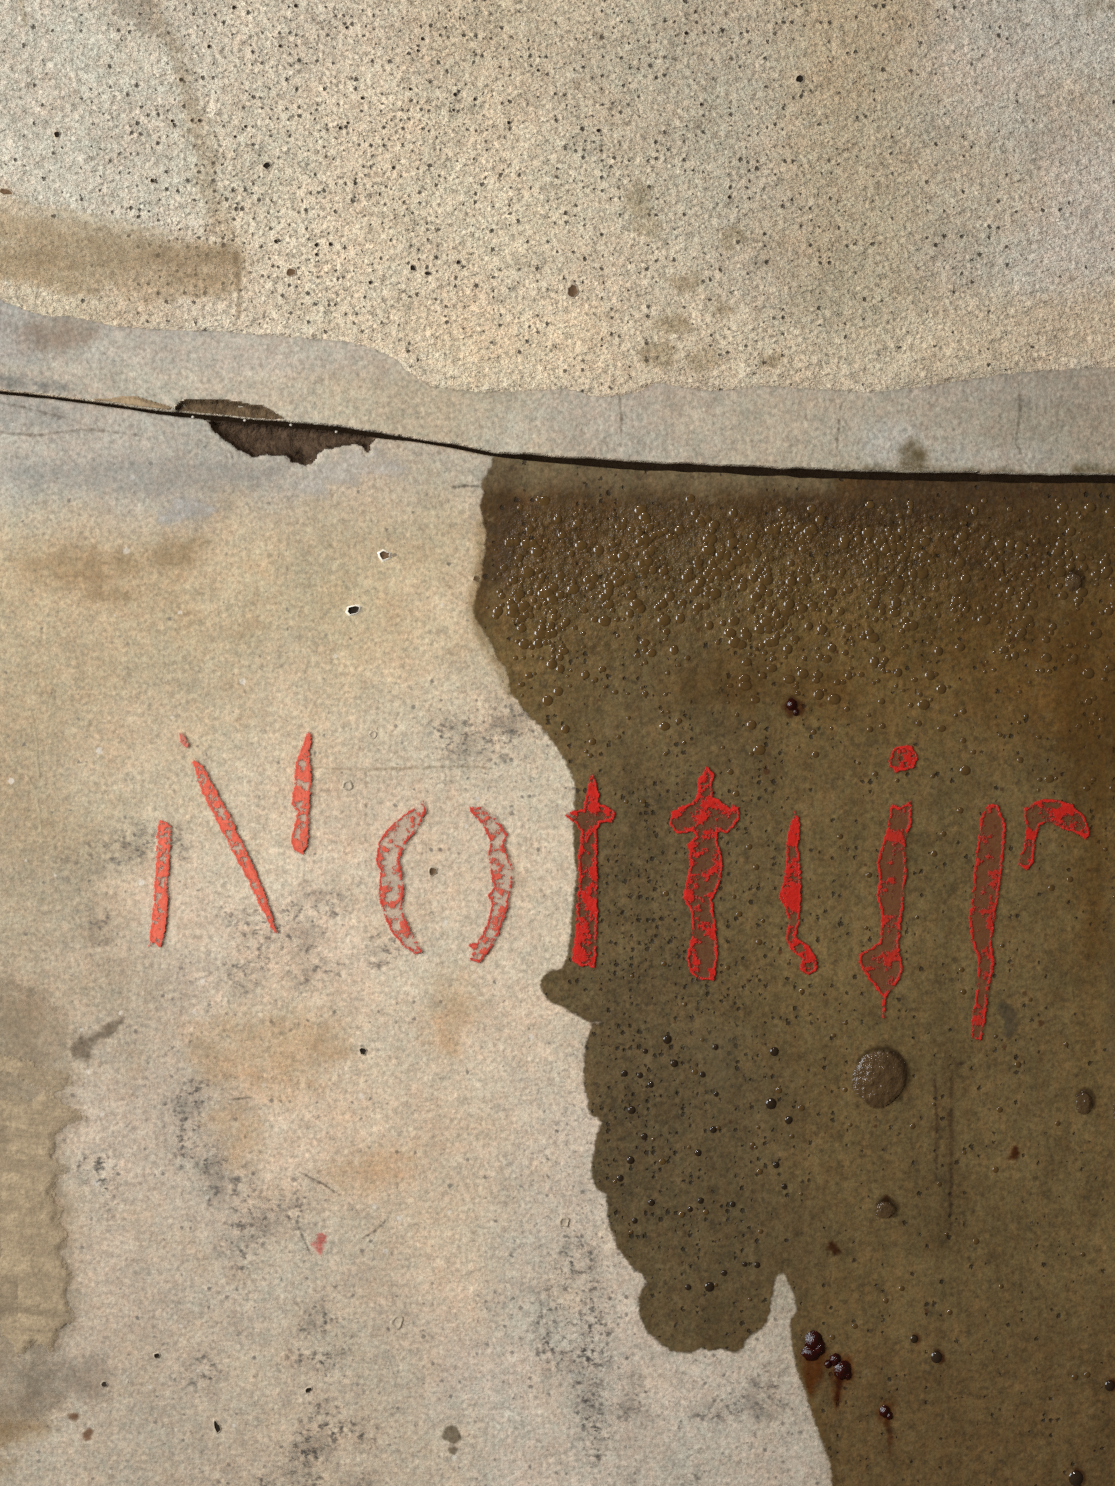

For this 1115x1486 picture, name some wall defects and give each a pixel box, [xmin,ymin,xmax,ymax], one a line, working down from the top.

spalling [94,396,376,466]
crack [0,391,1115,484]
water stain [437,456,1115,1486]
corrosion [801,1330,852,1381]
corrosion [879,1405,893,1420]